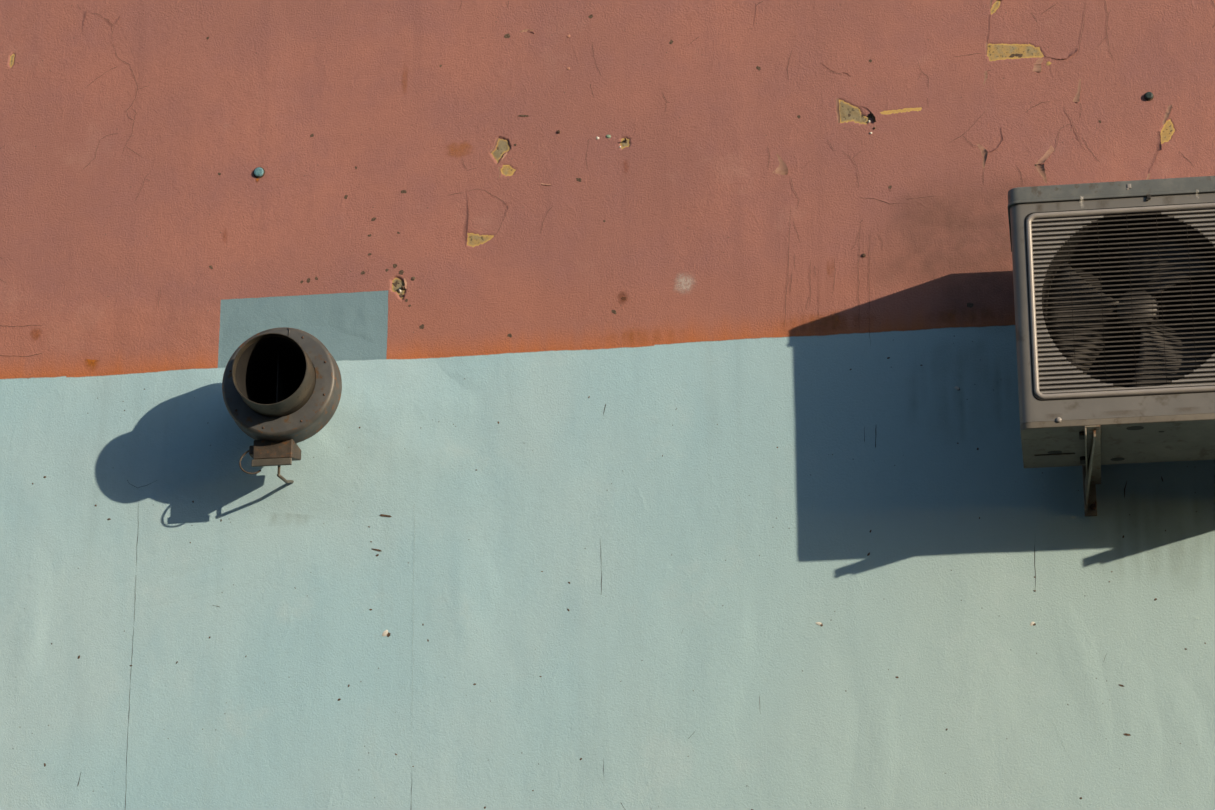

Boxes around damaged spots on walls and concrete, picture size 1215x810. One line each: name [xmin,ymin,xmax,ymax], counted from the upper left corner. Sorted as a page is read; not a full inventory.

peeling [957,0,1086,72]
crack [82,45,162,202]
spalling [490,138,516,178]
spalling [836,98,876,134]
peeling [1146,105,1194,180]
peeling [447,189,508,247]
crack [783,140,936,347]